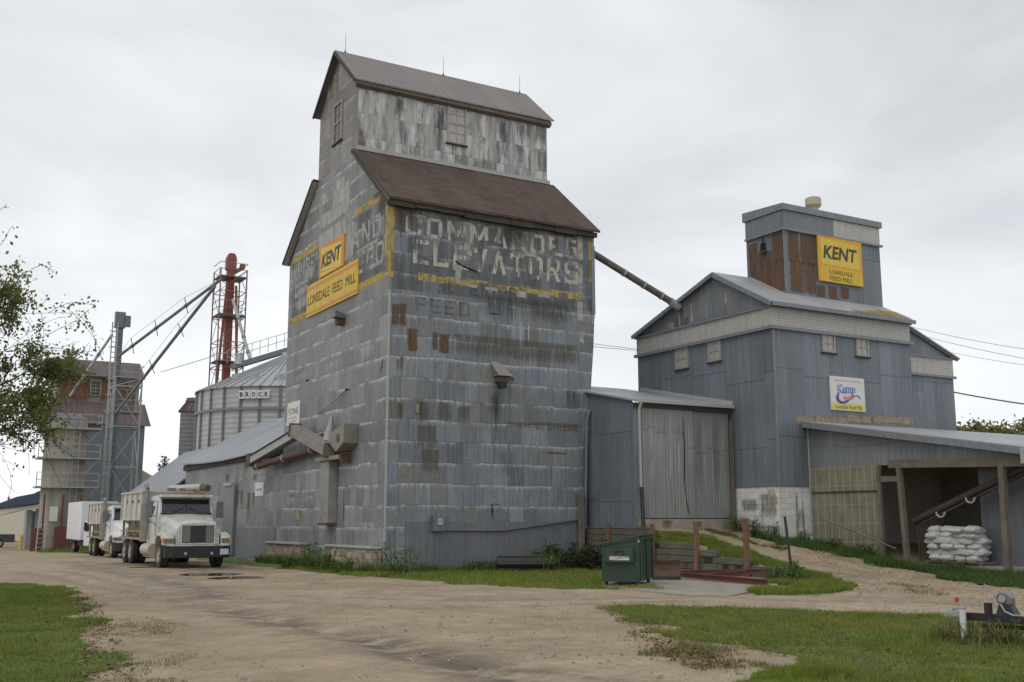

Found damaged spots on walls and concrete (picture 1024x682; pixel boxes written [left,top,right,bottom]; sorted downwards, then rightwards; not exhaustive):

corrosion [748,230,849,299]
corrosion [392,303,418,365]
corrosion [433,332,449,353]
crack [682,419,690,514]